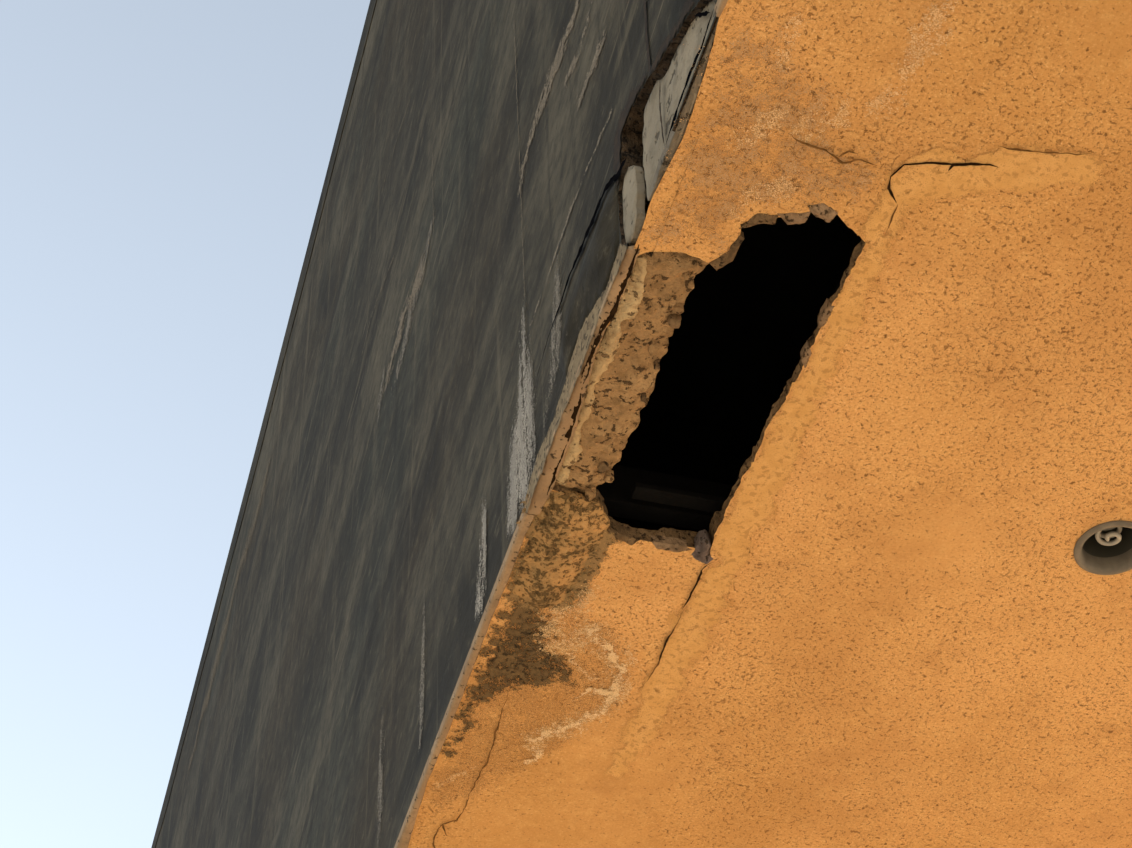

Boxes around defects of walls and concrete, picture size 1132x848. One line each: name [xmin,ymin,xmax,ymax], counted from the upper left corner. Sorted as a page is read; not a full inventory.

crack [788,133,1094,230]
spalling [524,0,862,515]
peeling [607,515,709,552]
leakage [418,606,428,752]
leakage [427,500,642,813]
crack [643,562,713,686]
crack [432,681,511,848]